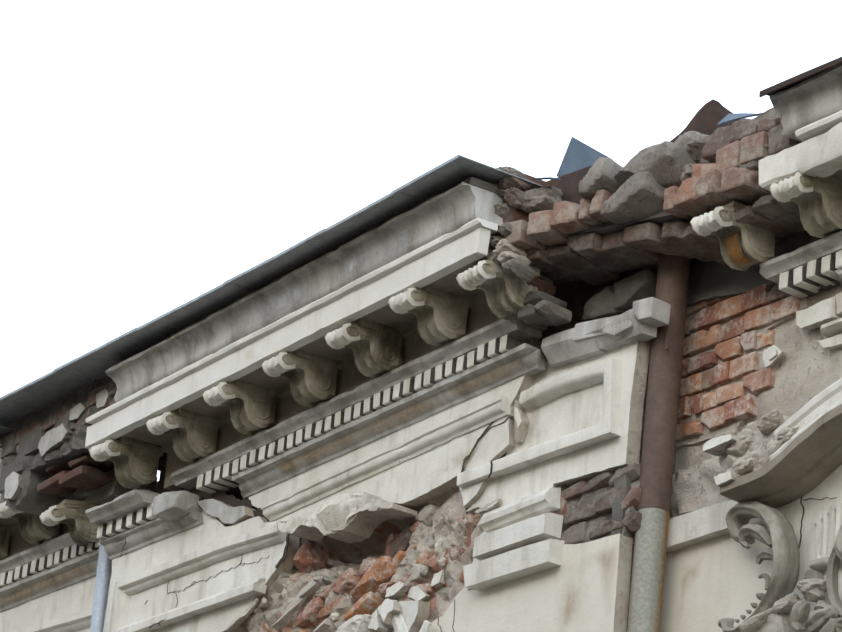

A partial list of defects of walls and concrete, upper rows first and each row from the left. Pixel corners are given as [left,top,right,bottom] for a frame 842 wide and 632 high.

spalling [490,107,806,326]
spalling [0,376,158,516]
crack [149,487,290,628]
spalling [226,486,502,632]
crack [460,421,494,473]
spalling [556,463,642,553]
spalling [670,283,810,518]
crack [798,497,837,548]